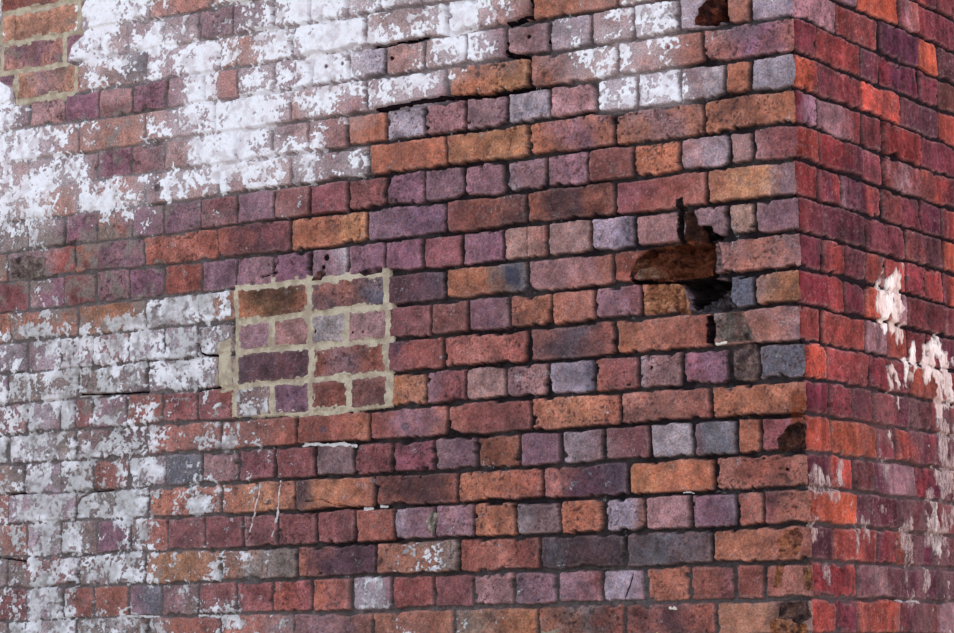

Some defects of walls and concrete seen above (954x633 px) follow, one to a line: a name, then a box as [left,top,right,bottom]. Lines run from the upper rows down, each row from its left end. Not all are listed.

peeling [551,0,730,118]
peeling [0,0,514,633]
spalling [626,209,763,392]
spalling [764,422,807,451]
damp [874,263,954,607]
spalling [756,528,803,588]
spalling [769,601,812,633]